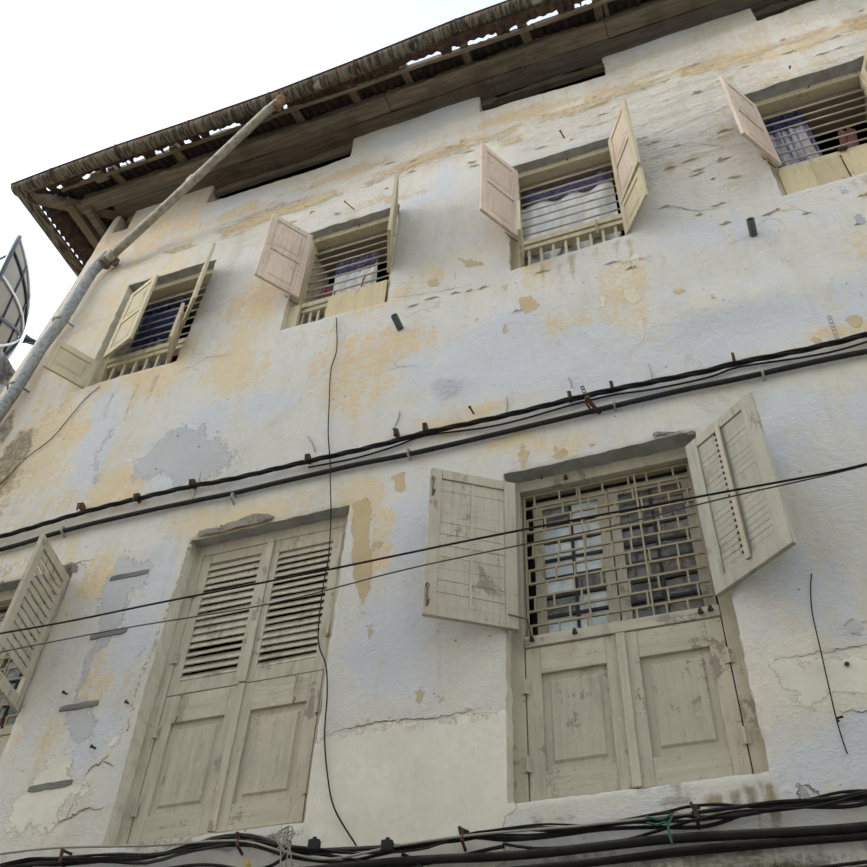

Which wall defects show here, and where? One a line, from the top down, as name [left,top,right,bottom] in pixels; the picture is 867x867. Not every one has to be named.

peeling [459,259,483,267]
peeling [513,296,539,313]
leakage [0,412,31,486]
peeling [132,423,237,487]
peeling [391,472,405,491]
peeling [351,497,383,613]
peeling [5,556,153,838]